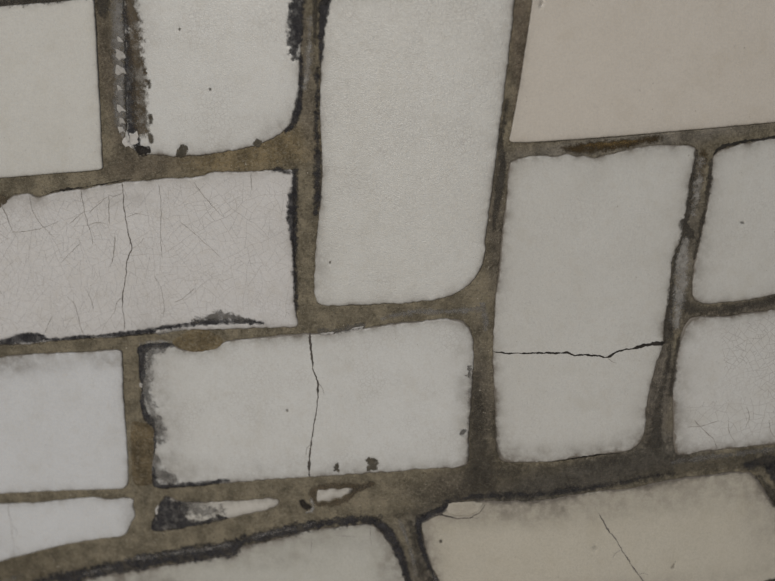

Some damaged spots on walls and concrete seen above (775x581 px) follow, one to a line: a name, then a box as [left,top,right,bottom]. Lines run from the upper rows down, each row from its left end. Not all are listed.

spalling [111,0,153,156]
rust [564,136,663,153]
crack [0,178,290,335]
spalling [0,311,264,532]
crack [305,333,325,477]
crack [493,341,665,364]
crack [599,514,648,581]